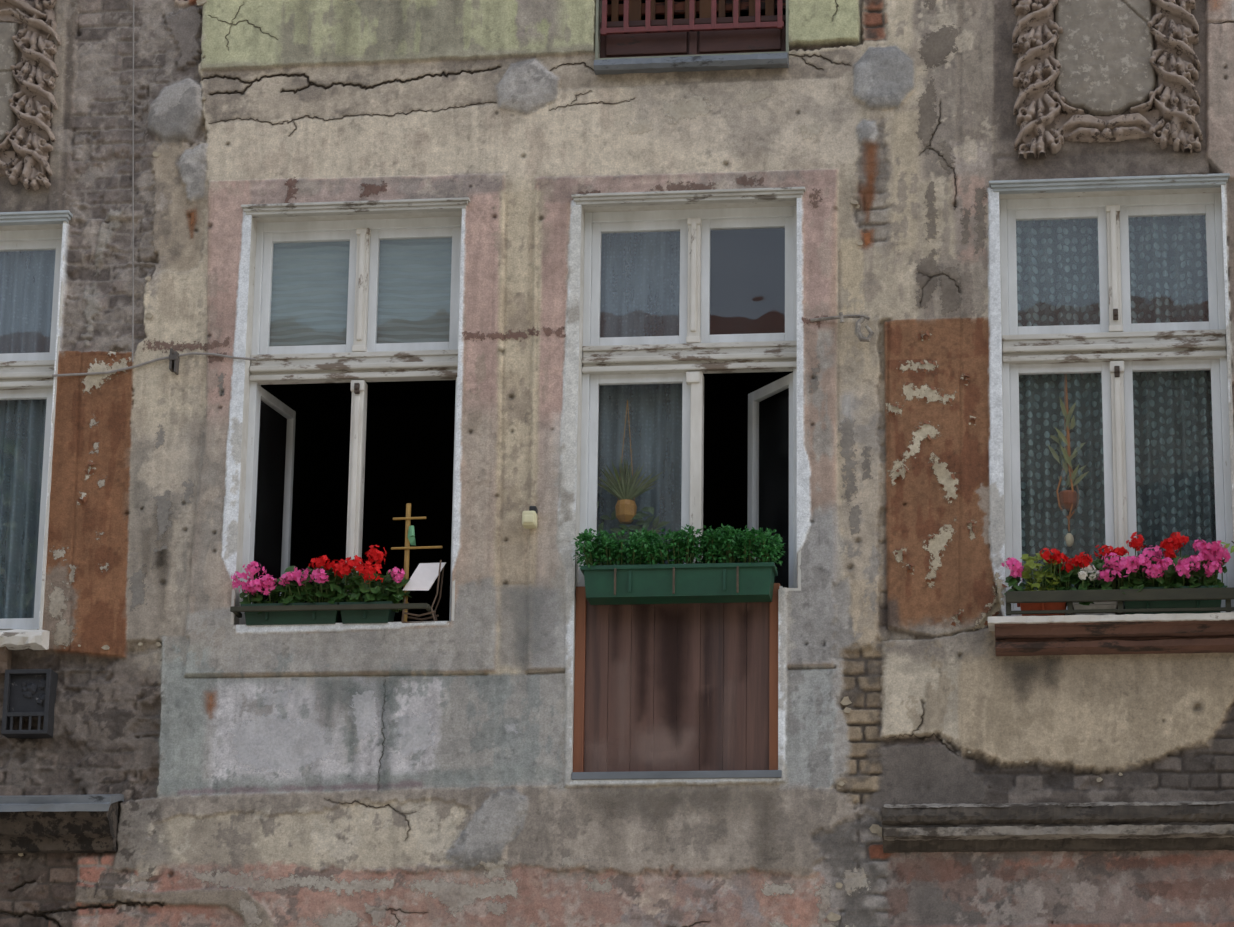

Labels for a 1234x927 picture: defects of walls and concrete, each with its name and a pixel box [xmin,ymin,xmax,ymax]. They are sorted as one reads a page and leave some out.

crack [202,4,500,136]
crack [549,62,635,111]
spalling [61,0,231,396]
peeling [910,181,962,317]
crack [919,103,957,210]
peeling [885,360,971,416]
peeling [887,420,960,503]
peeling [893,519,977,588]
spalling [0,546,164,801]
crack [324,679,414,840]
peeling [0,647,1234,927]
crack [0,880,164,927]